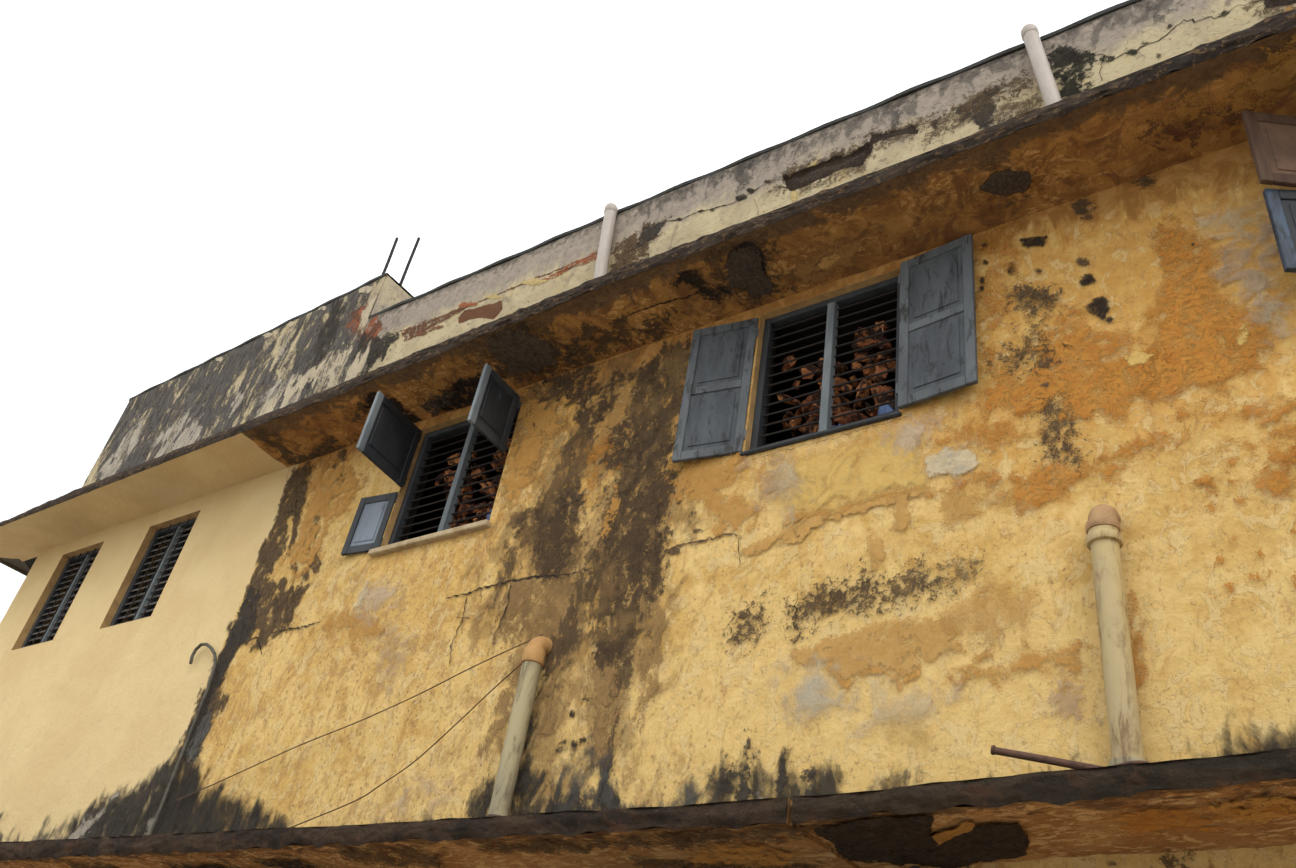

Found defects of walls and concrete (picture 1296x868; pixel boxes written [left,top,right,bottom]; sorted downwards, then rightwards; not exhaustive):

crack [1091,0,1263,80]
spalling [1242,0,1296,19]
spalling [768,120,937,202]
spalling [979,169,1033,195]
water stain [85,279,400,482]
crack [664,529,740,565]
water stain [466,210,1296,818]
water stain [0,402,373,842]
water stain [309,580,396,656]
crack [445,567,592,665]
peeling [249,858,321,868]
spalling [336,815,1030,868]